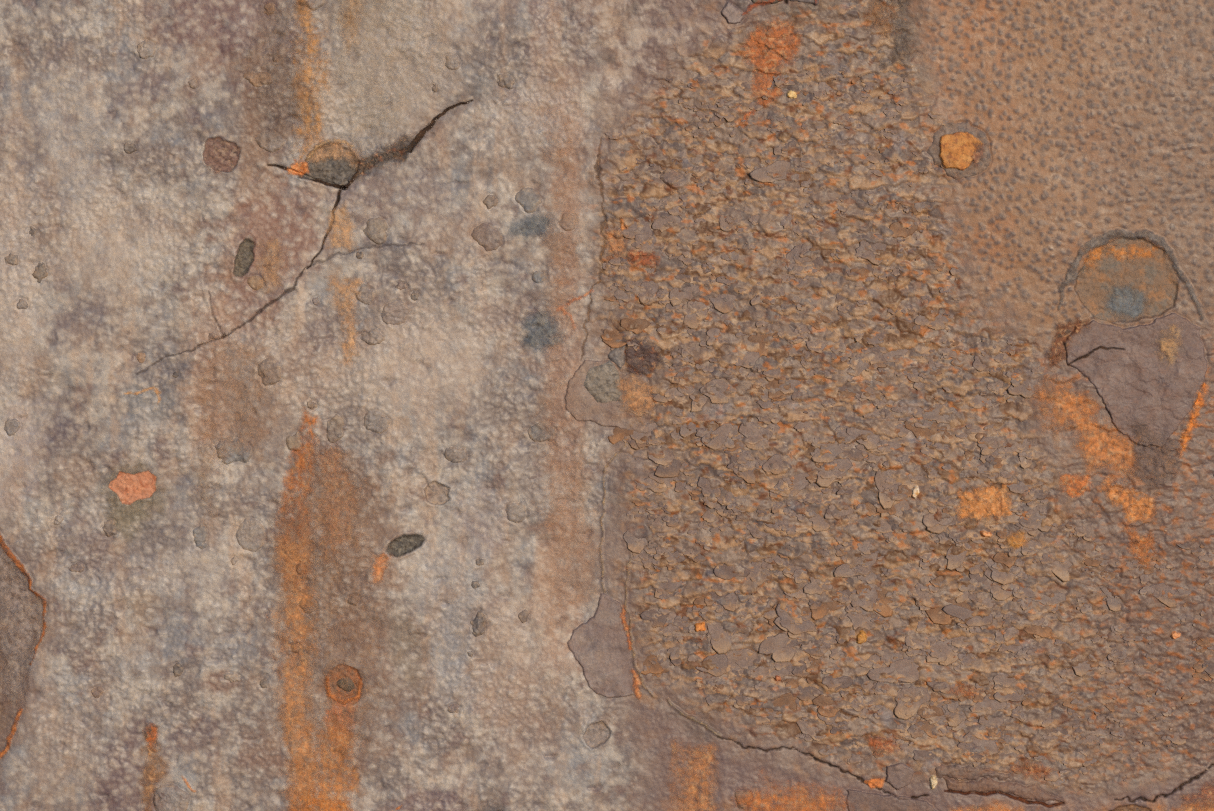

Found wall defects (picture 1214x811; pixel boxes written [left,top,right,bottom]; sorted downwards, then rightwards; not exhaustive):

rust [721,0,819,24]
rust [264,0,326,159]
crack [396,100,473,157]
crack [157,164,364,362]
spalling [1058,229,1204,322]
rust [556,19,1214,793]
rust [109,471,156,504]
rust [230,517,266,565]
rust [278,399,368,811]
rust [678,746,715,811]
rust [734,787,835,811]
crack [1115,764,1214,802]